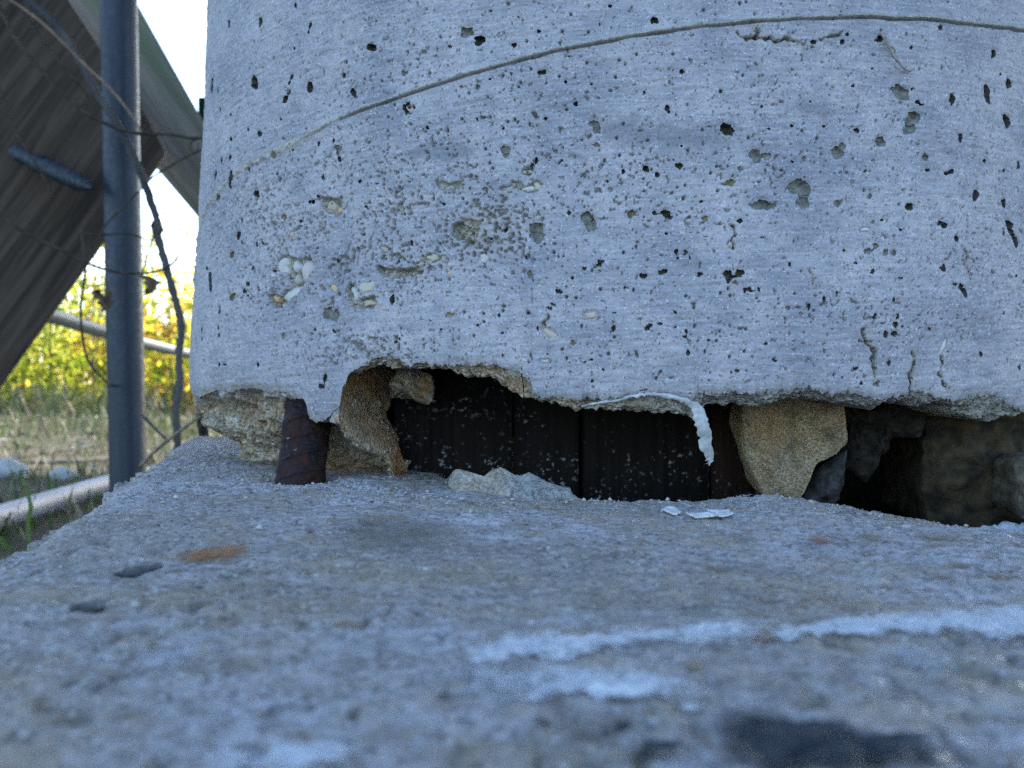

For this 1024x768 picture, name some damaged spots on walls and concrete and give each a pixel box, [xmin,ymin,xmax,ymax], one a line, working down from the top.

crack [736,27,839,44]
spalling [319,356,1024,476]
spalling [194,388,294,465]
peeling [661,505,681,515]
peeling [707,509,733,517]